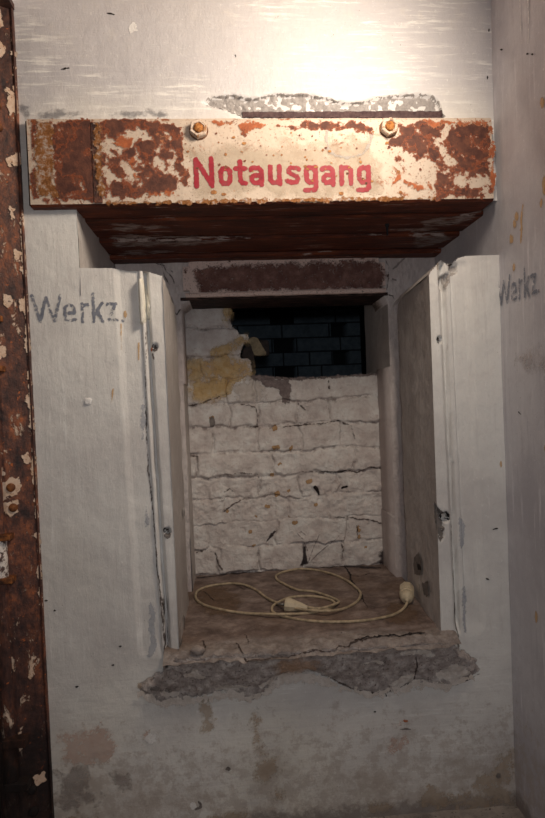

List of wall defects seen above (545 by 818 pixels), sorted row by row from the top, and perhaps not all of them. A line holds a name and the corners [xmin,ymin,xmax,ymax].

spalling [206,93,445,118]
corrosion [30,118,496,206]
corrosion [194,259,388,293]
peeling [251,373,377,403]
crack [188,393,258,428]
crack [285,403,355,436]
crack [302,466,380,474]
crack [337,516,382,607]
crack [236,632,425,662]
peeling [138,643,479,702]
crack [328,657,421,694]